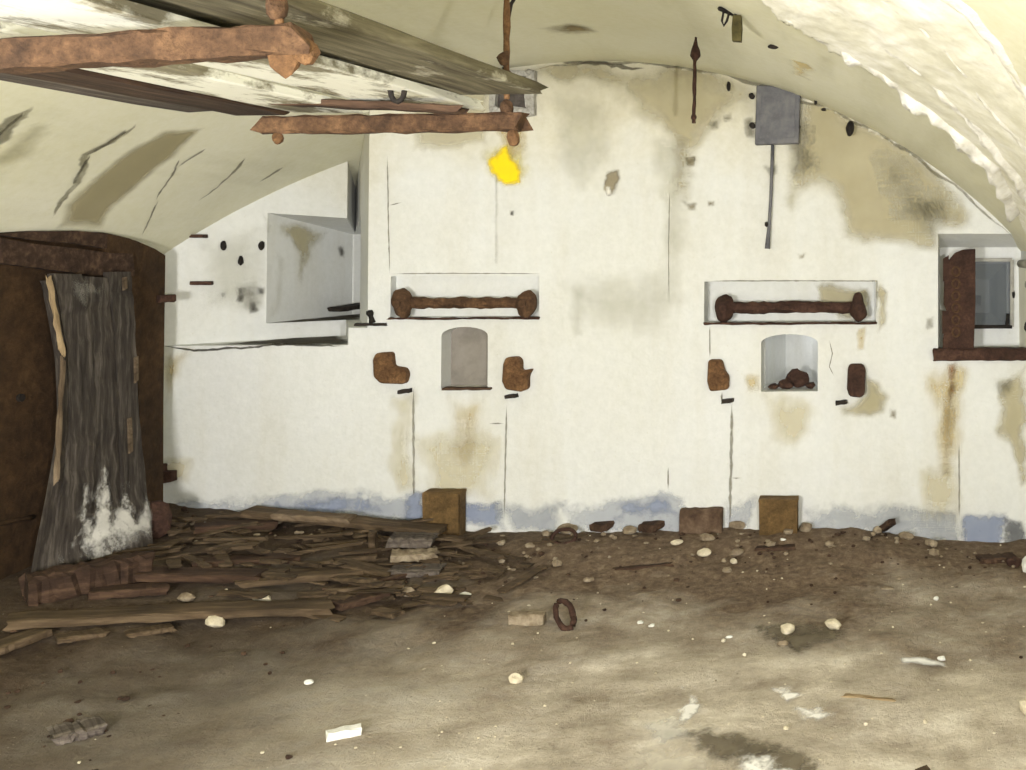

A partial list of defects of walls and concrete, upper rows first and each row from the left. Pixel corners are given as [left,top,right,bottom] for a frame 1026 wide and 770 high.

crack [0,114,24,143]
damp [628,68,731,186]
crack [54,129,132,212]
crack [144,151,203,231]
damp [795,104,964,246]
rust [941,366,962,440]